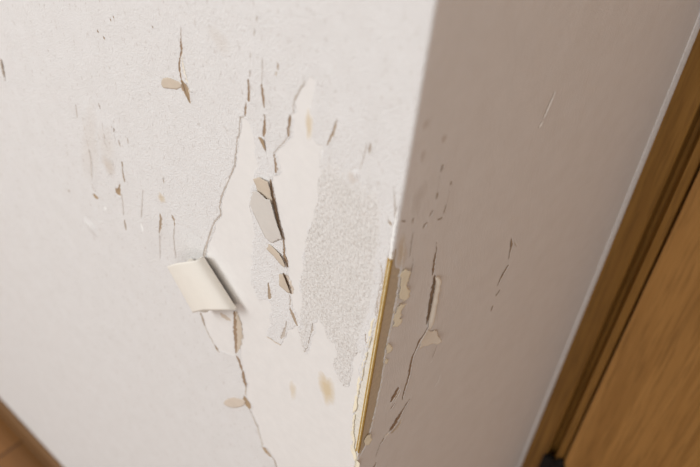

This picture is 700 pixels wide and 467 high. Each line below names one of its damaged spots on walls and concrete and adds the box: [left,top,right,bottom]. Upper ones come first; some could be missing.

crack [161,34,191,103]
crack [200,311,277,467]
peeling [200,77,374,467]
peeling [384,269,411,366]
peeling [402,242,442,400]
crack [491,239,517,311]